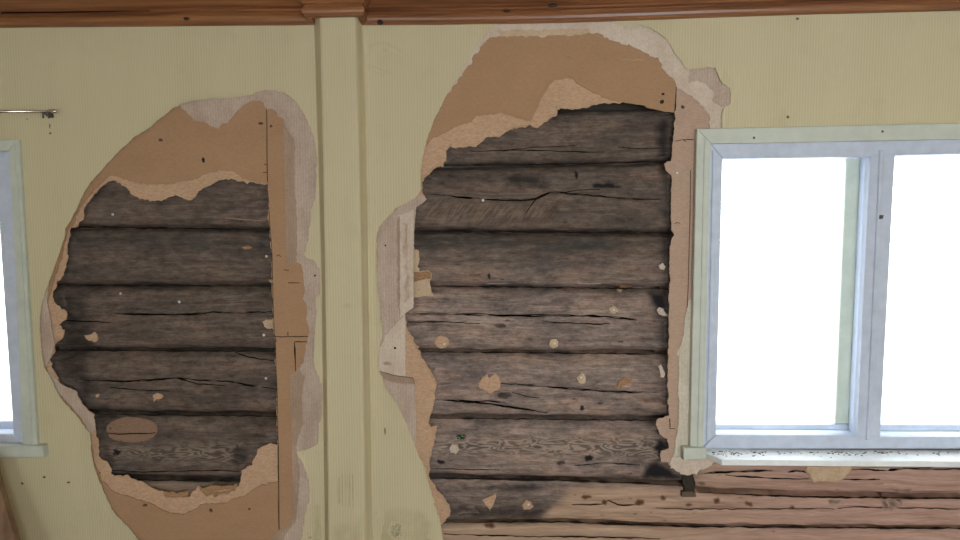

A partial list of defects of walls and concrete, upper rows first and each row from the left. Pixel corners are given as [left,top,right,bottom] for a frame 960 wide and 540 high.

crack [432,189,658,213]
crack [65,311,274,323]
crack [83,377,276,391]